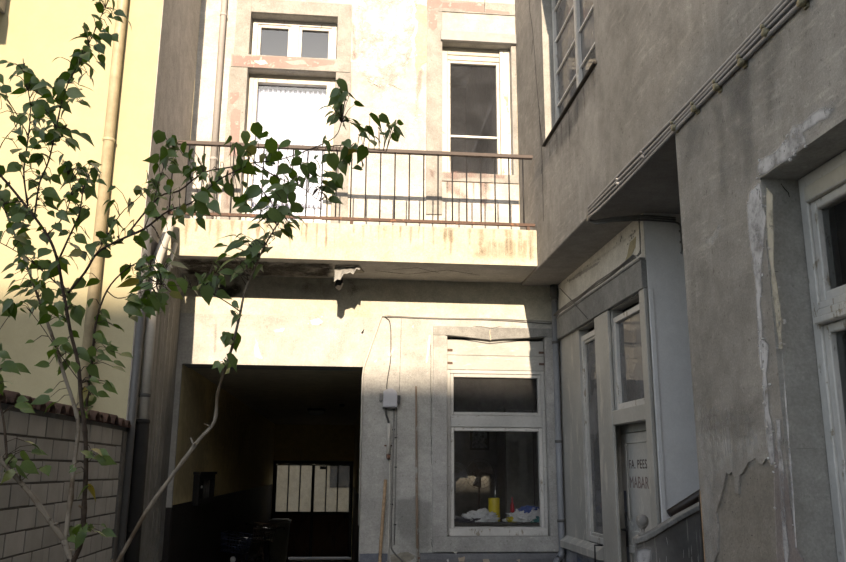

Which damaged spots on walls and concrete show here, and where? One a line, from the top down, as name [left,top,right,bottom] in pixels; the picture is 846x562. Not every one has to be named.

peeling [414,0,510,75]
damp [217,285,241,297]
damp [183,259,332,276]
peeling [747,108,831,562]